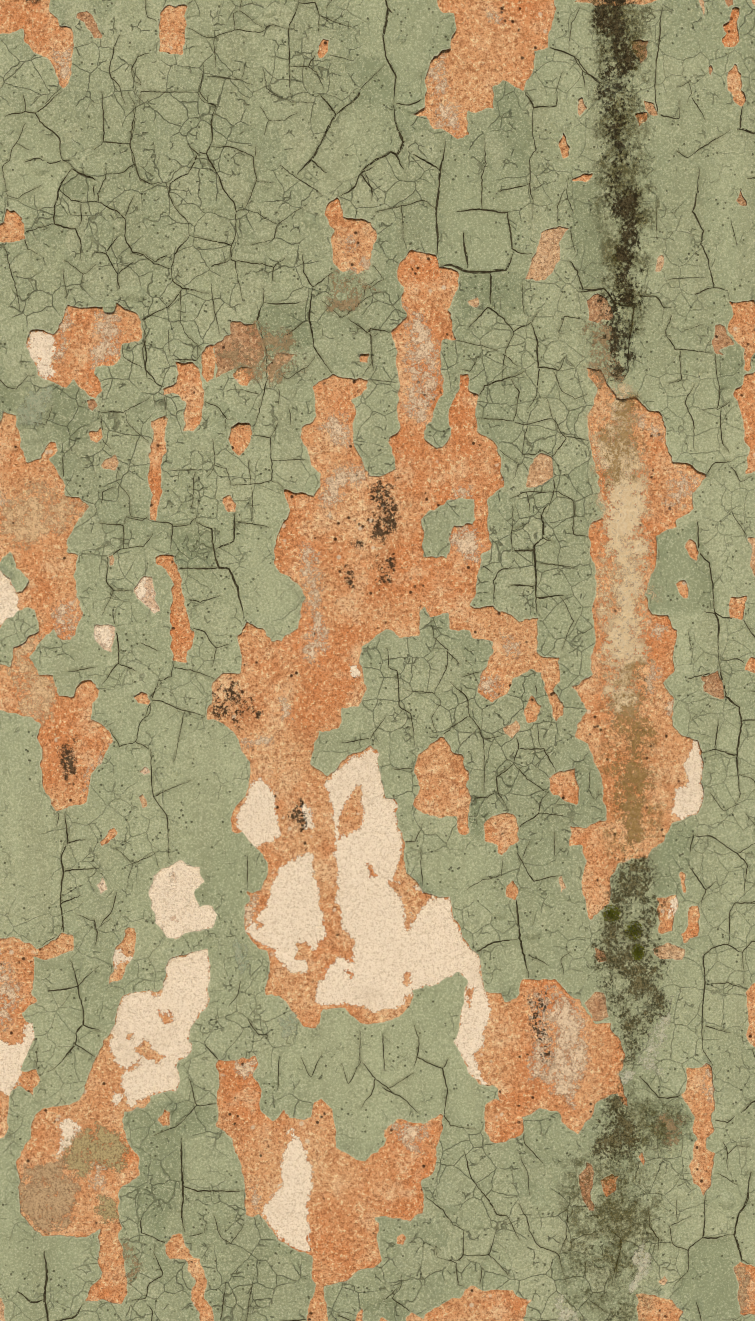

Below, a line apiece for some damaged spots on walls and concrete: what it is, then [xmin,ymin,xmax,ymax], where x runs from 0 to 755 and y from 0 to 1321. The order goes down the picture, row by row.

damp [582,0,659,860]
peeling [0,412,115,811]
peeling [148,860,217,939]
peeling [206,250,706,1143]
crack [688,522,755,1065]
peeling [16,927,210,1304]
crack [132,1077,244,1321]
peeling [216,1056,443,1321]
crack [229,981,568,1286]
damp [592,1014,683,1159]
efflorescence [629,1240,652,1293]
crack [648,1100,755,1321]